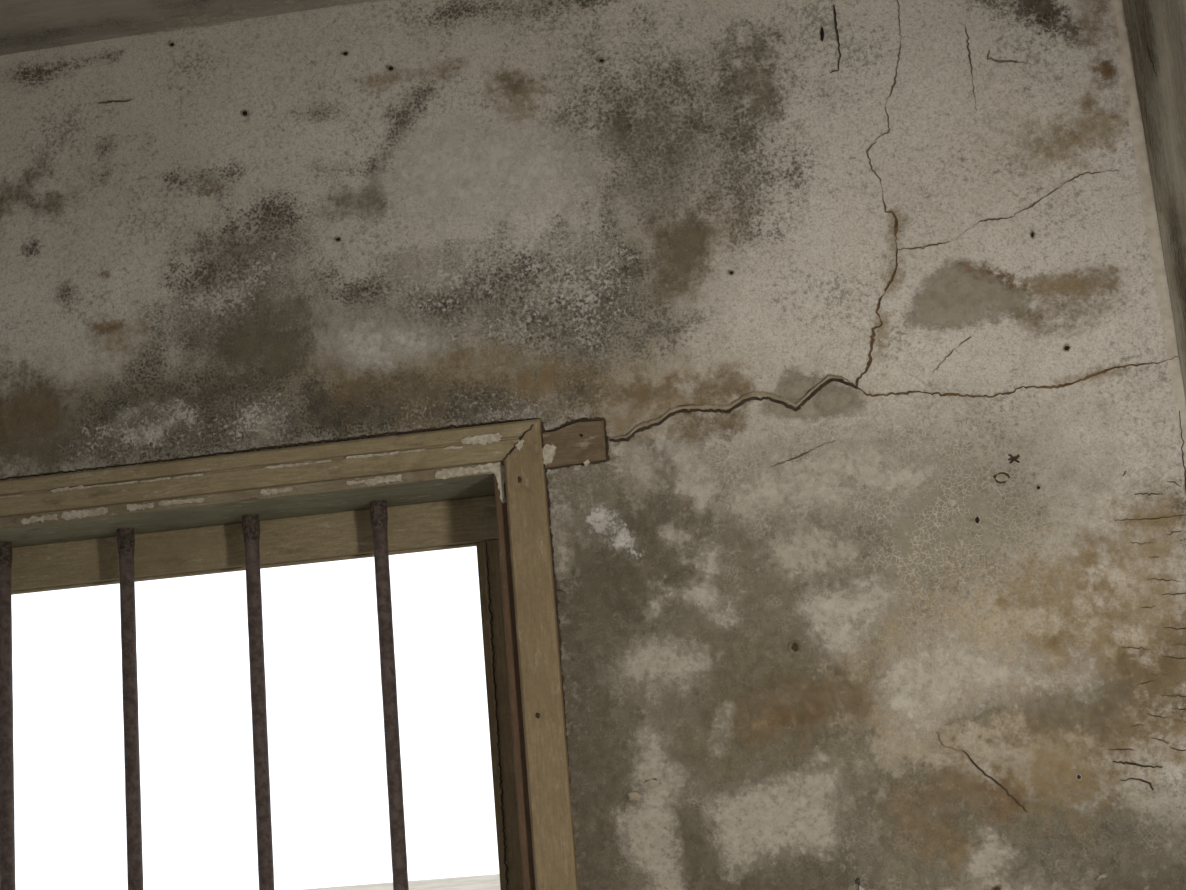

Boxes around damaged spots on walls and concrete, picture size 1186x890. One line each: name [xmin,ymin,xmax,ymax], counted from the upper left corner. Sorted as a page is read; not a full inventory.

damp [433,0,605,25]
damp [976,0,1105,45]
damp [1098,61,1112,77]
damp [0,33,812,476]
crack [609,0,1178,442]
damp [908,260,1117,329]
damp [765,370,863,420]
damp [547,425,1186,890]